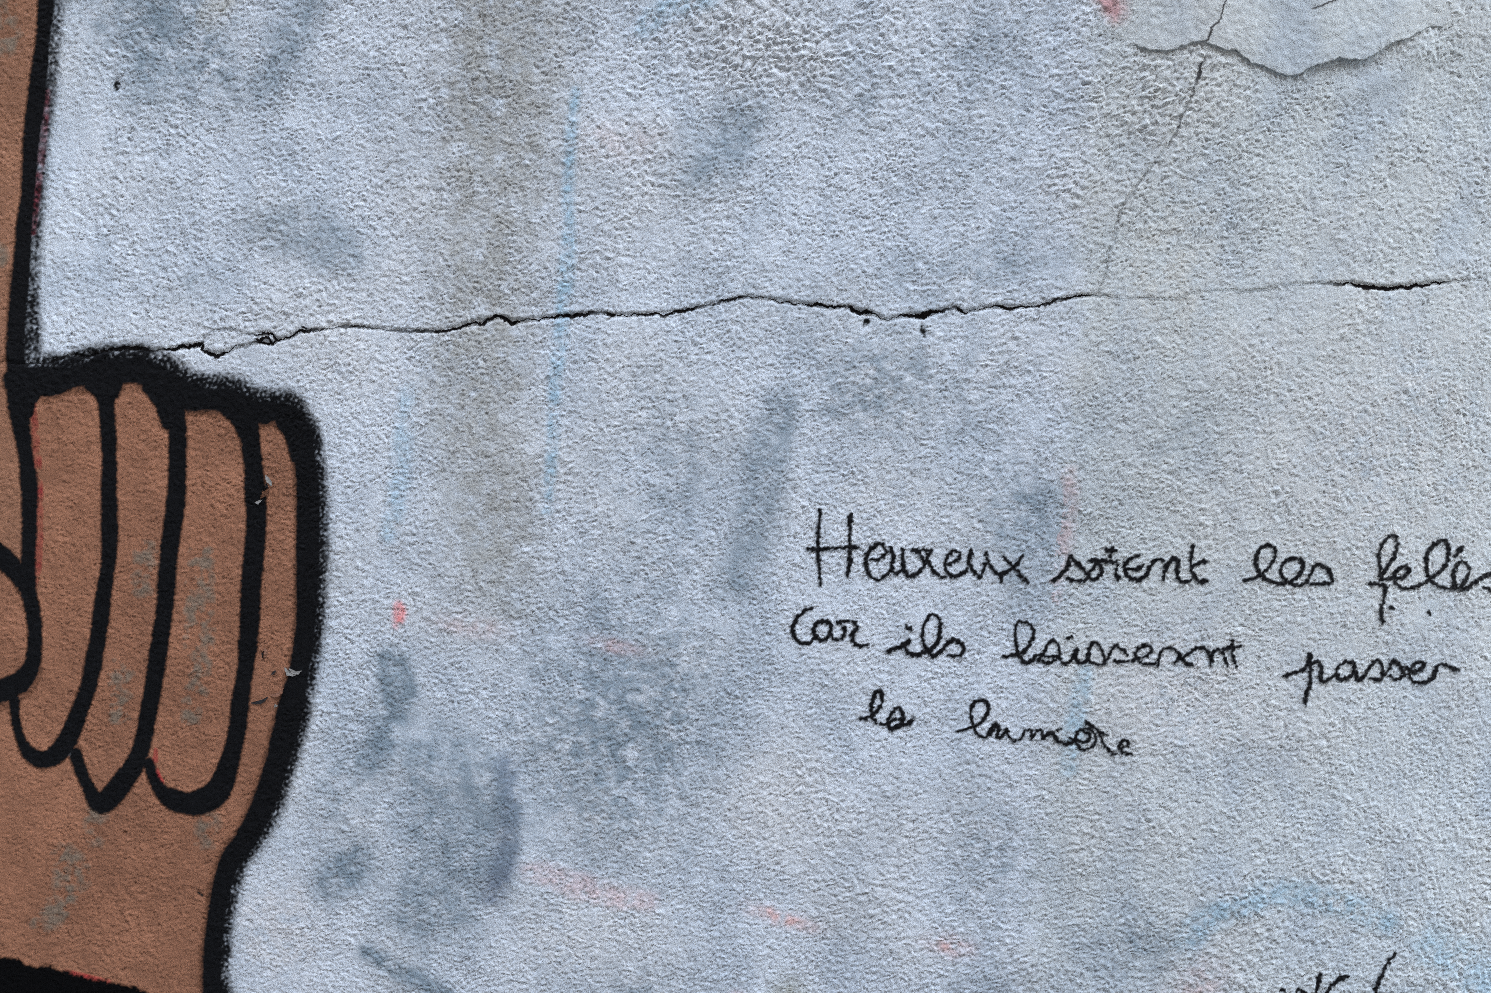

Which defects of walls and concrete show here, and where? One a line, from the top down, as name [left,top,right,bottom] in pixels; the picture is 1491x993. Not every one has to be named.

peeling [1091,0,1461,76]
crack [0,58,1491,365]